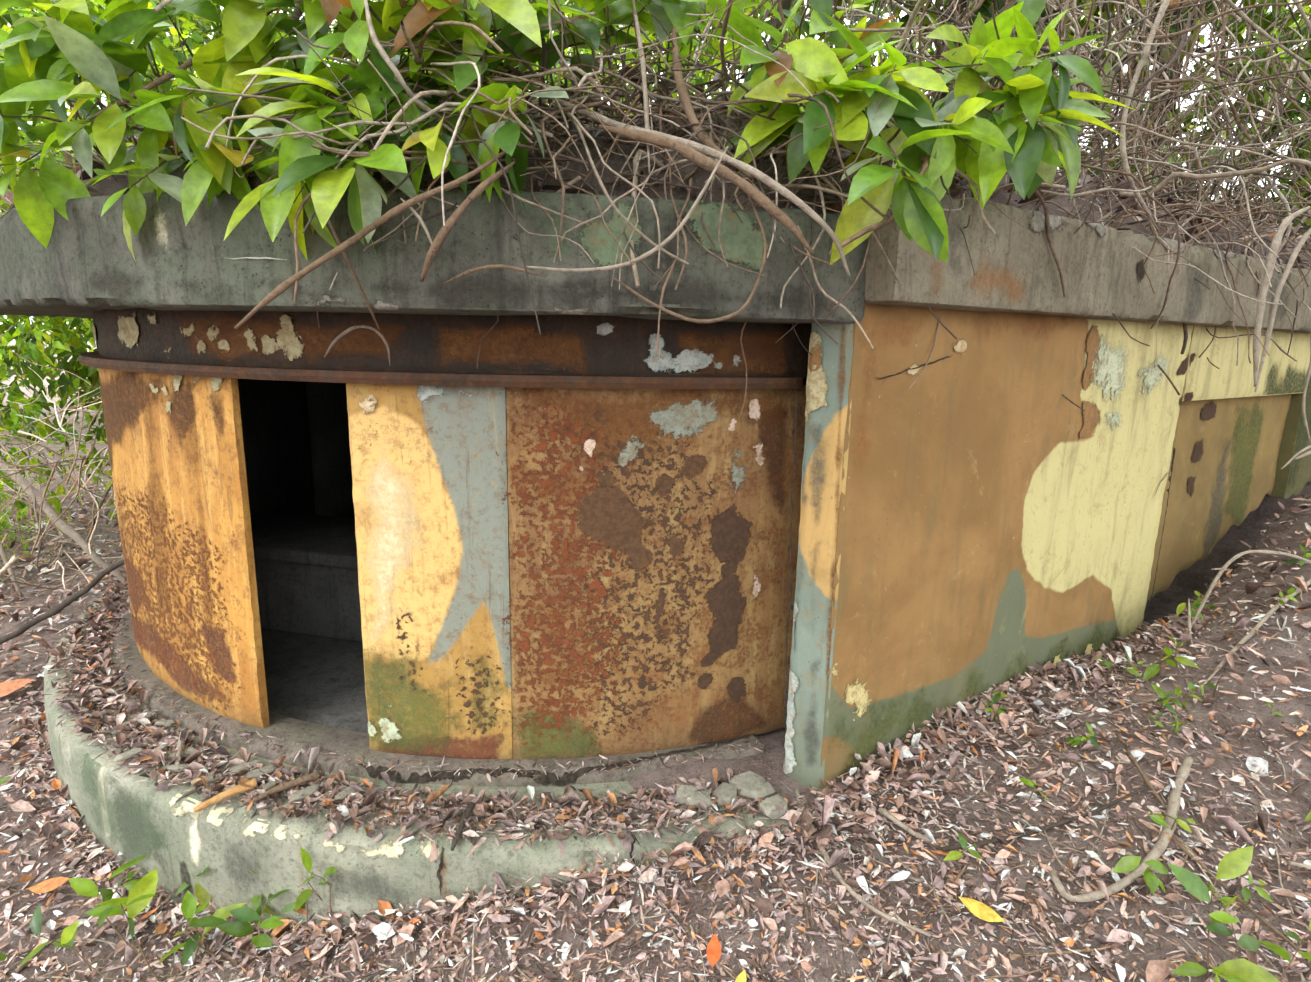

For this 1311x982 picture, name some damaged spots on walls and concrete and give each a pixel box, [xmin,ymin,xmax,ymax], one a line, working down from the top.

peeling [118,311,156,349]
peeling [180,322,230,355]
peeling [243,314,305,361]
corrosion [180,317,402,359]
peeling [642,333,742,373]
corrosion [680,333,785,373]
corrosion [99,372,195,468]
corrosion [211,396,223,433]
corrosion [523,388,785,509]
spalling [577,396,761,572]
corrosion [125,560,235,699]
crack [437,847,447,896]